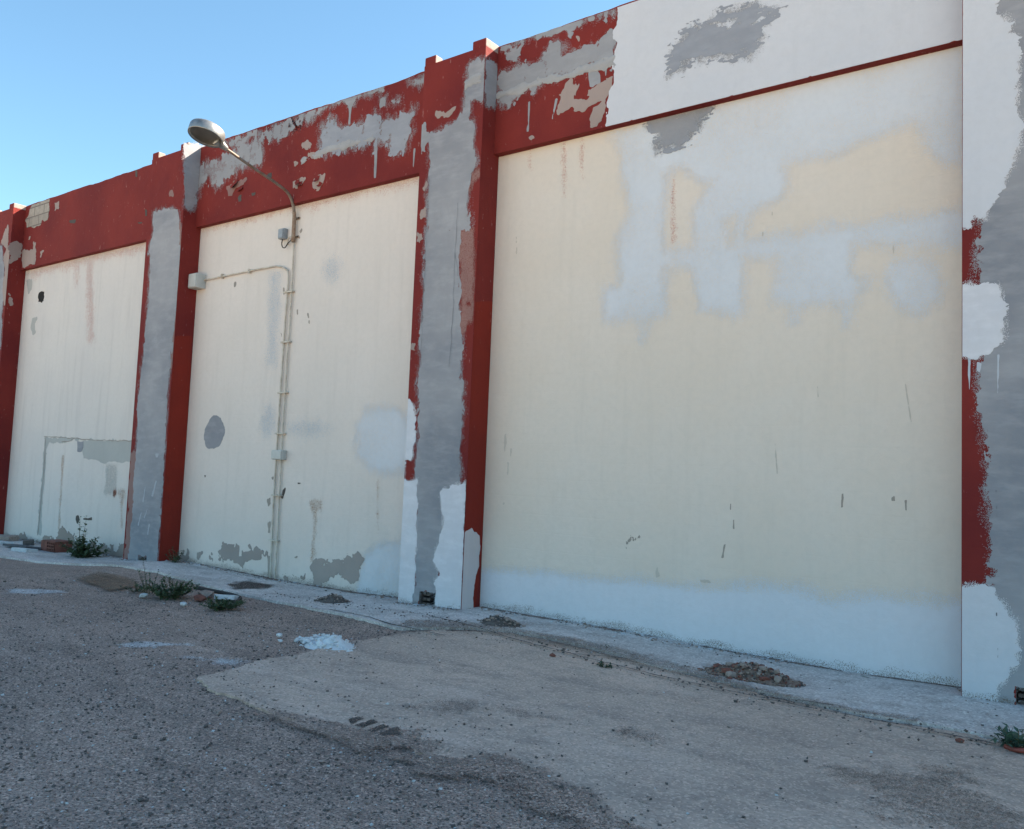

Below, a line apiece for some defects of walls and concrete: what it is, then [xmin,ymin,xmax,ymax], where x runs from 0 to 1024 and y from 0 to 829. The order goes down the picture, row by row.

peeling [500,11,615,63]
peeling [288,75,424,130]
peeling [435,106,456,119]
peeling [556,68,613,128]
peeling [226,177,255,202]
peeling [293,140,325,191]
spalling [1,199,59,306]
peeling [458,227,476,335]
peeling [405,399,416,464]
peeling [19,436,93,548]
peeling [91,450,136,559]
spalling [178,542,365,587]